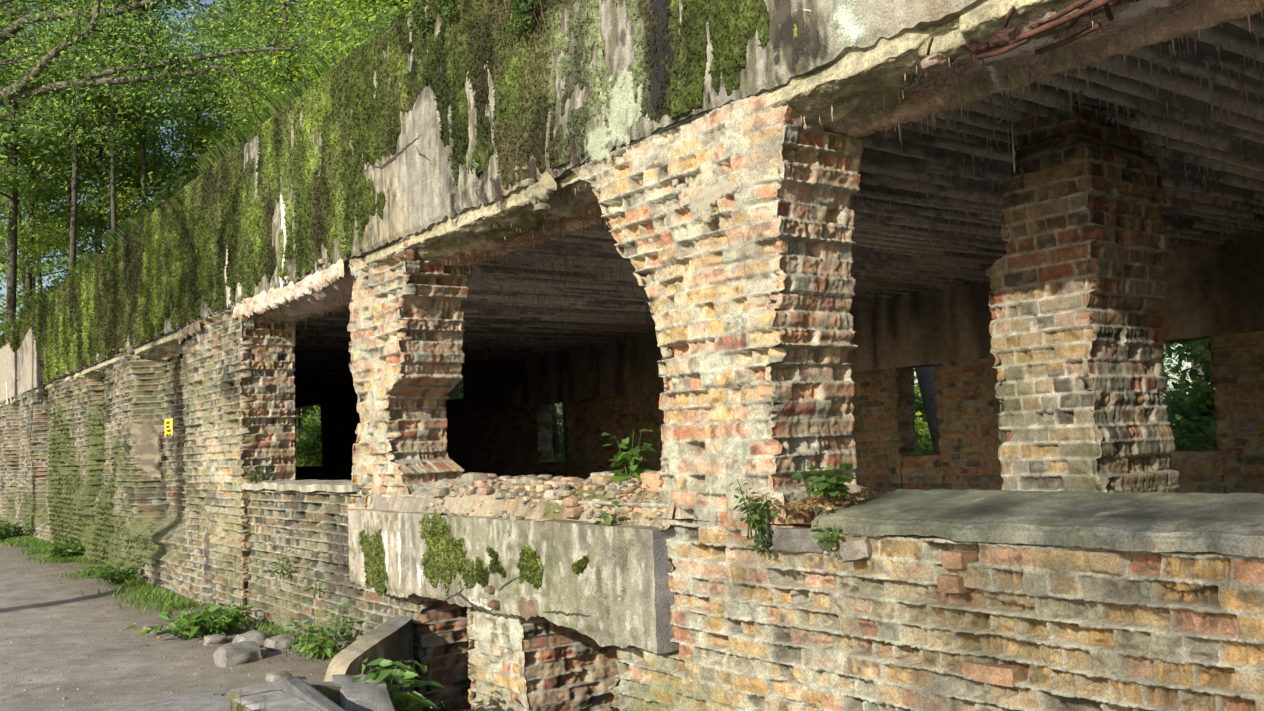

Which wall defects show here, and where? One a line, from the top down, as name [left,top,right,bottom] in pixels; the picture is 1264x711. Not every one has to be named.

leakage [1103,0,1171,26]
leakage [914,35,1058,84]
corrosion [898,0,1256,110]
leakage [473,176,559,245]
leakage [225,248,242,307]
leakage [279,195,354,317]